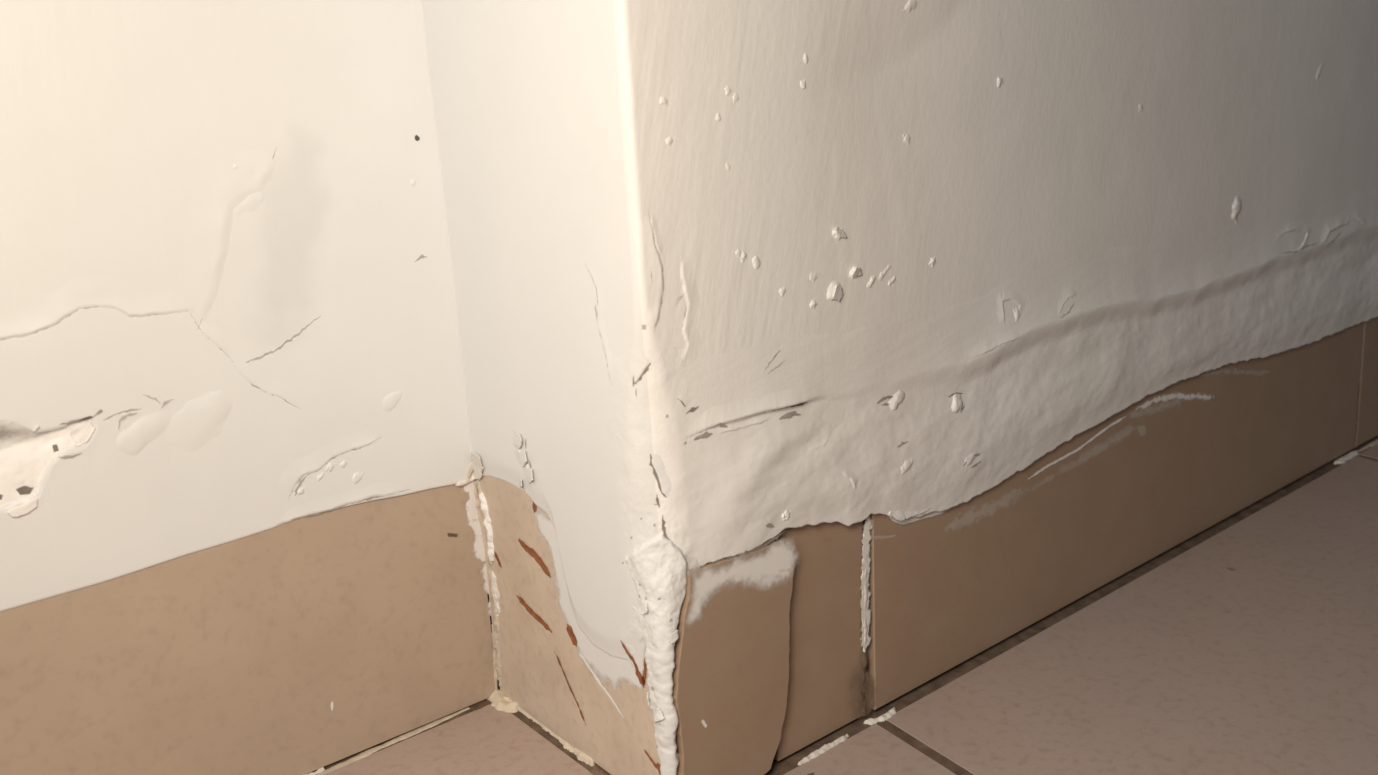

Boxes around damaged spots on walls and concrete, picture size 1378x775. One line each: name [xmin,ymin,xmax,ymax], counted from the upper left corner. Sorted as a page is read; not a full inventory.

peeling [634,210,665,330]
spalling [0,408,106,520]
corrosion [518,539,551,578]
spalling [603,345,797,775]
corrosion [516,595,577,646]
corrosion [621,642,647,688]